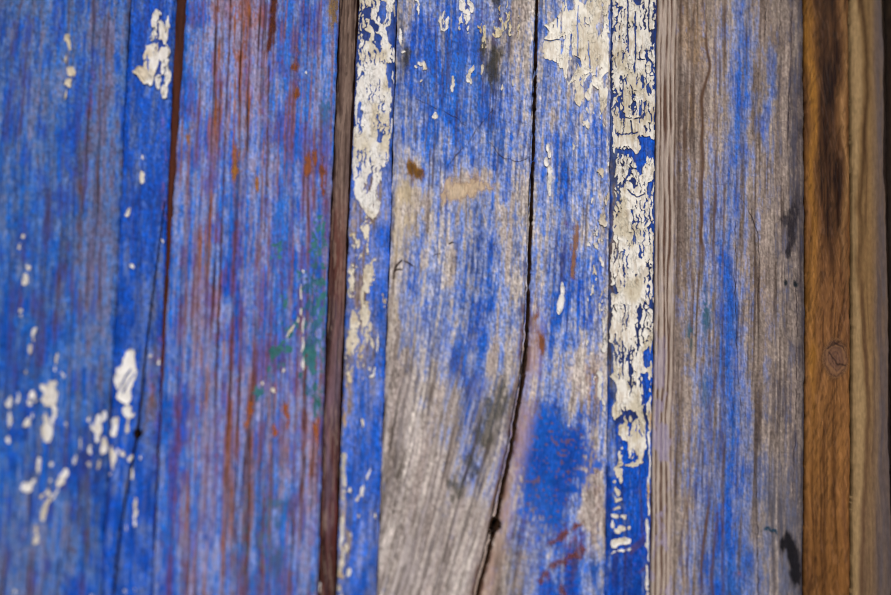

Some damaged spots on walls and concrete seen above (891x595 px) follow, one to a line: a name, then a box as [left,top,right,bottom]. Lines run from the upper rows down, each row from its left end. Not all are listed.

peeling [5,353,67,443]
peeling [21,348,141,545]
crack [112,203,165,595]
peeling [132,9,171,99]
peeling [338,452,370,595]
peeling [342,0,406,436]
crack [473,0,538,595]
peeling [543,0,656,595]